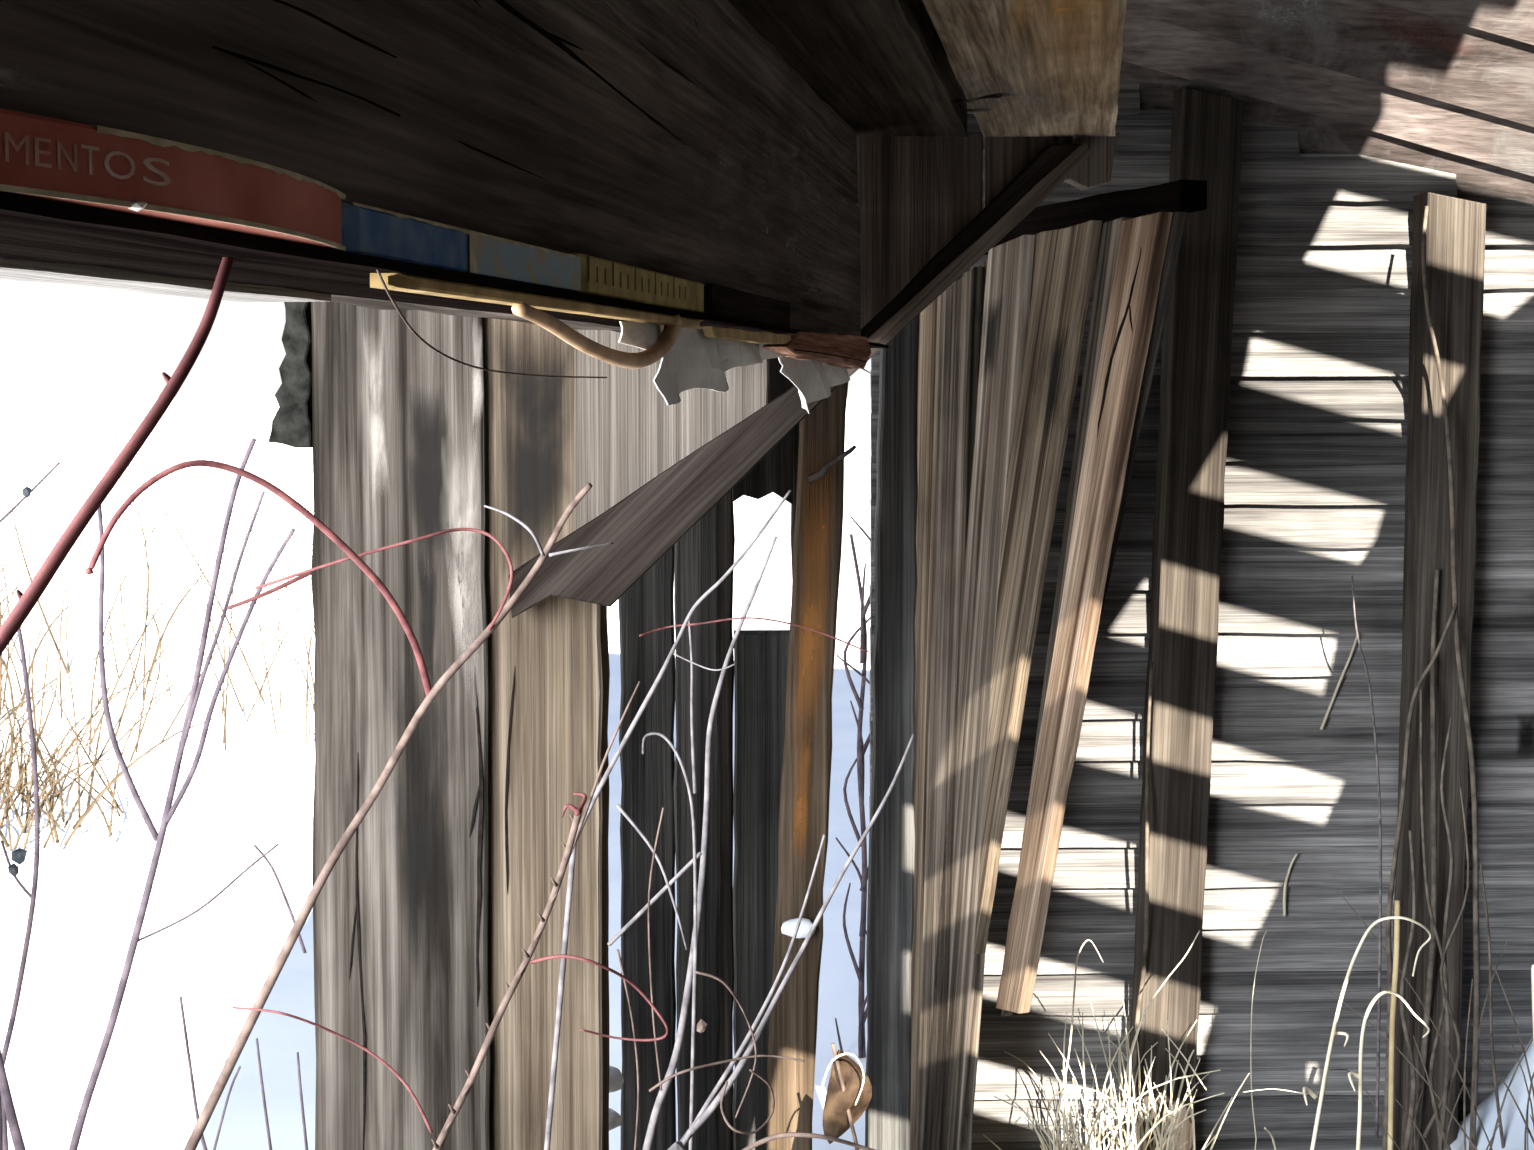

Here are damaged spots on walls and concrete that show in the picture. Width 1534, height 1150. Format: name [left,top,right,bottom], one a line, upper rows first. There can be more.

corrosion [799,599,822,705]
corrosion [794,792,806,839]